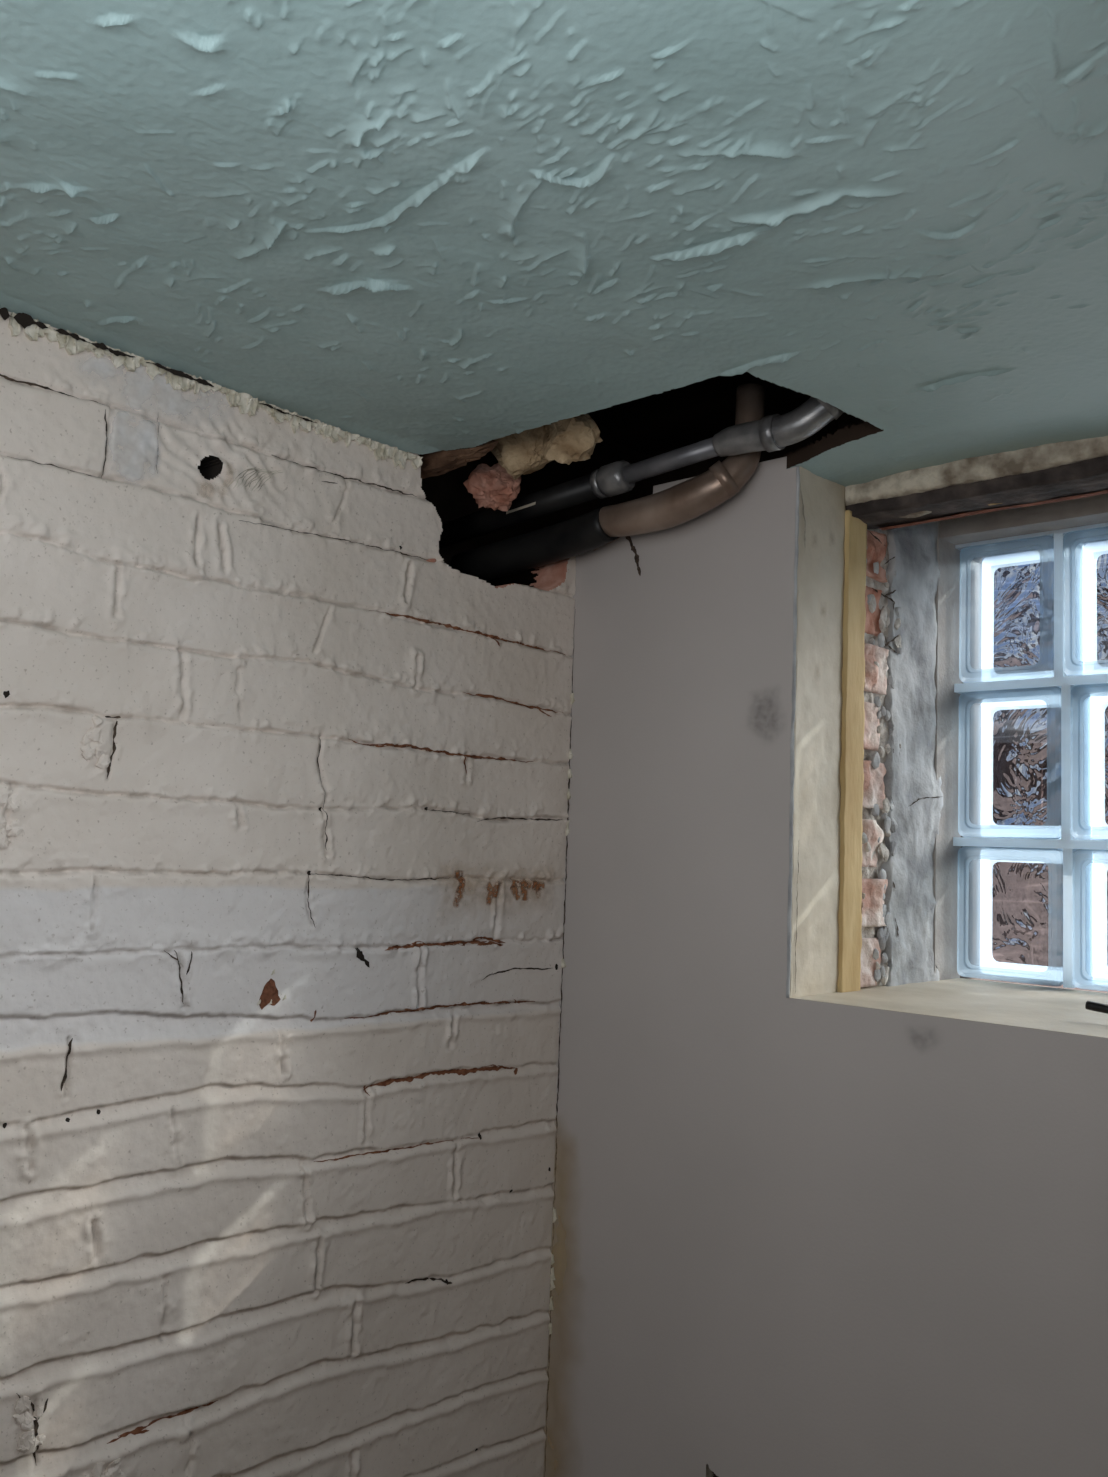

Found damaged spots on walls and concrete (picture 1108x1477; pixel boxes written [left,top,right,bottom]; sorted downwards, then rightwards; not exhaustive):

spalling [495,558,570,591]
corrosion [454,870,465,906]
corrosion [487,879,544,904]
peeling [257,969,286,1009]